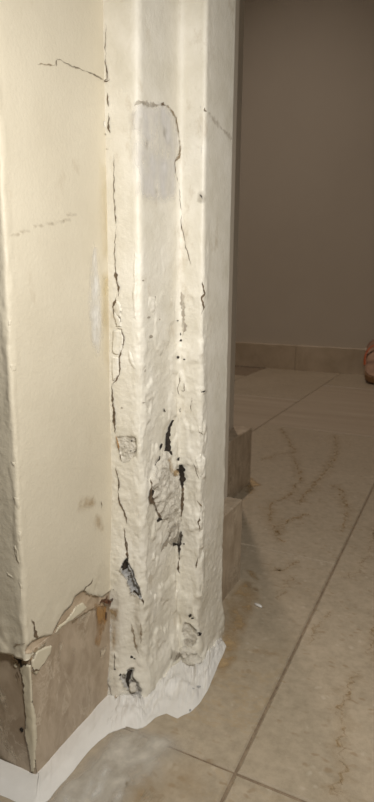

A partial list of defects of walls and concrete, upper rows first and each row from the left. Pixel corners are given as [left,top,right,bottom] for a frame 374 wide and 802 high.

crack [42,32,110,132]
crack [111,167,127,551]
crack [177,283,205,409]
spalling [116,436,137,462]
spalling [148,420,186,573]
spalling [120,541,144,604]
peeling [13,579,105,667]
spalling [114,654,142,699]
spalling [175,614,202,666]